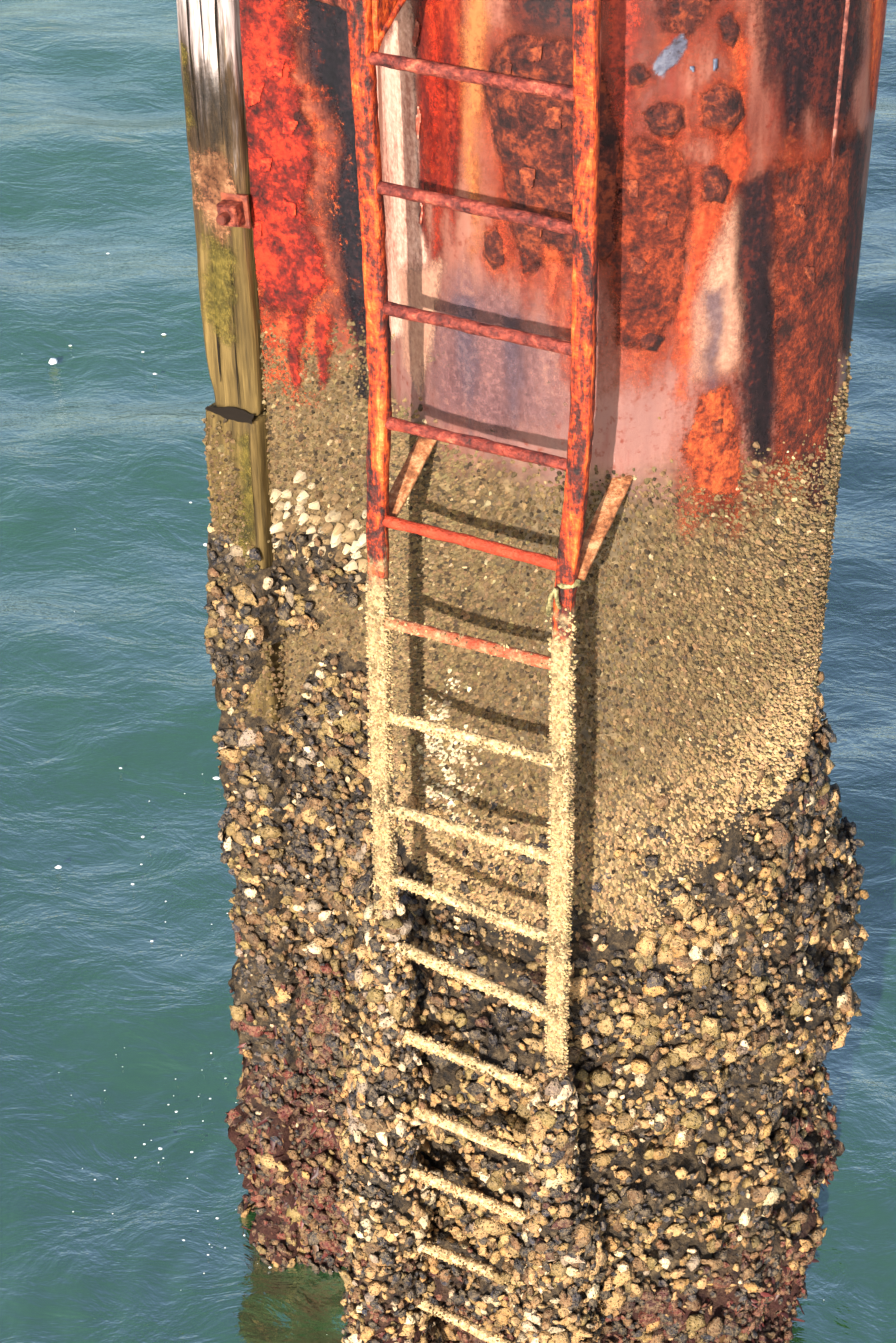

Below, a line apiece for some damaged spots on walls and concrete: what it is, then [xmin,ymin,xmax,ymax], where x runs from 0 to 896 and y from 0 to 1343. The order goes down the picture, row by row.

rust [191,0,357,408]